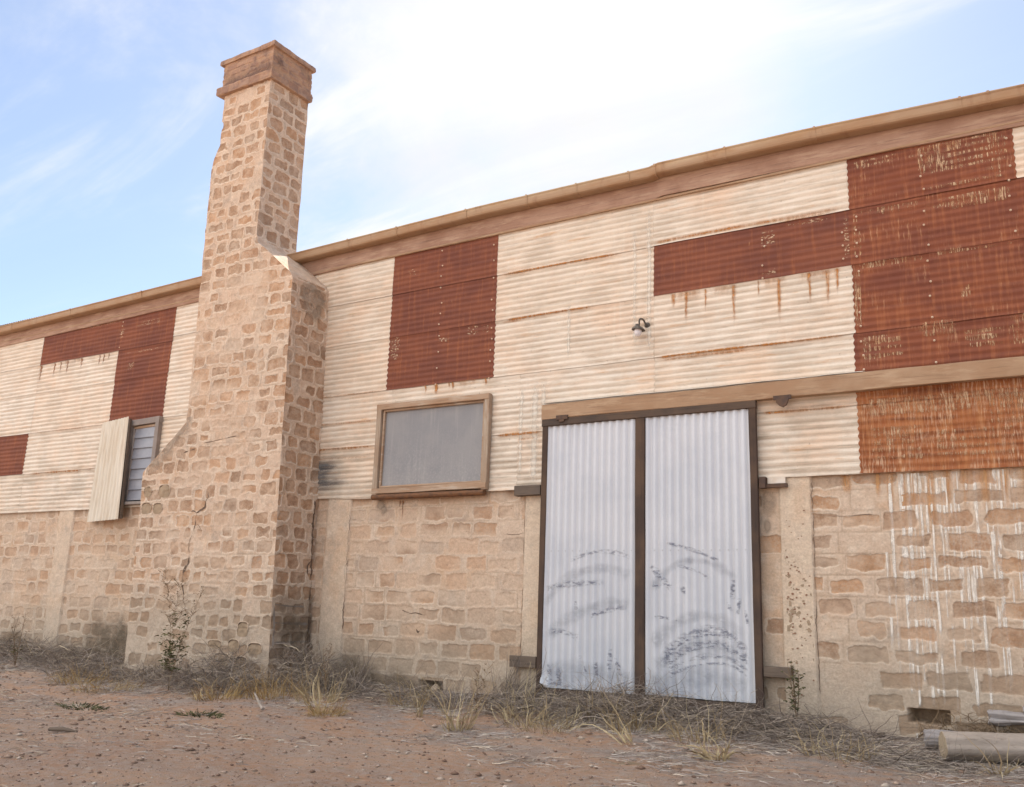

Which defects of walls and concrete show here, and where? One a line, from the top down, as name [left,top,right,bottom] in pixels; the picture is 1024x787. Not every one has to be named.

damp [318,463,337,485]
crack [182,495,209,611]
damp [886,469,1024,705]